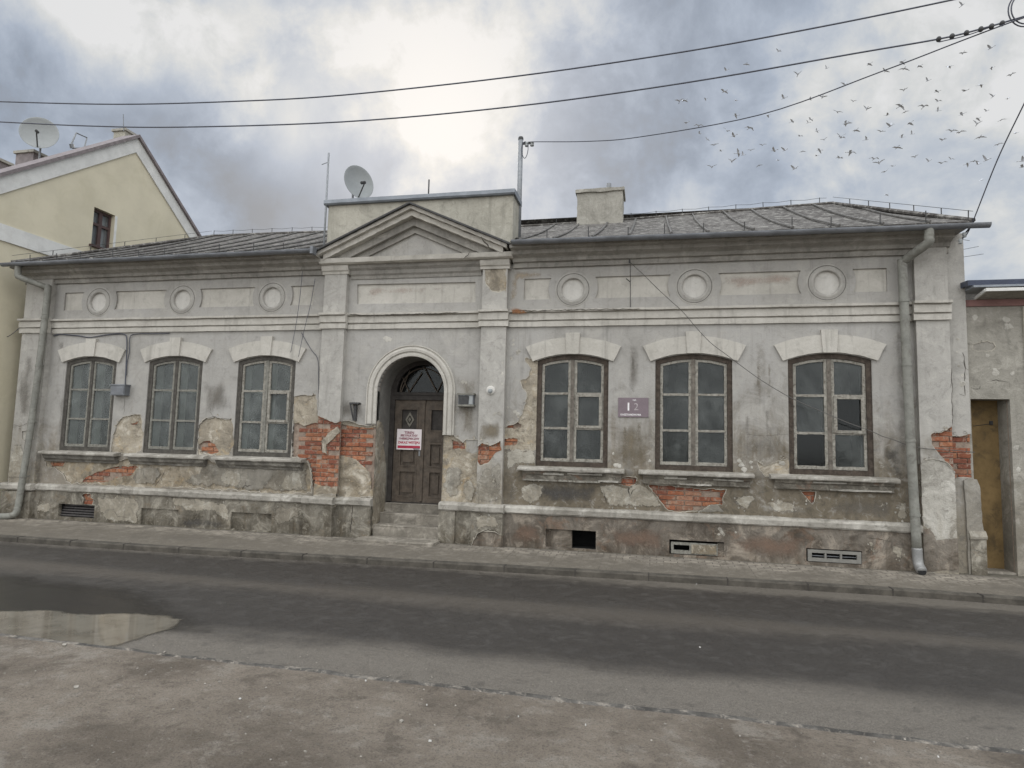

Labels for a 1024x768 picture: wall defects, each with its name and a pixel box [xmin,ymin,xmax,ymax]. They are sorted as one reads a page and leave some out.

flaking render [46,391,386,532]
flaking render [441,339,538,547]
flaking render [612,452,755,513]
flaking render [768,490,816,512]
flaking render [920,426,972,572]